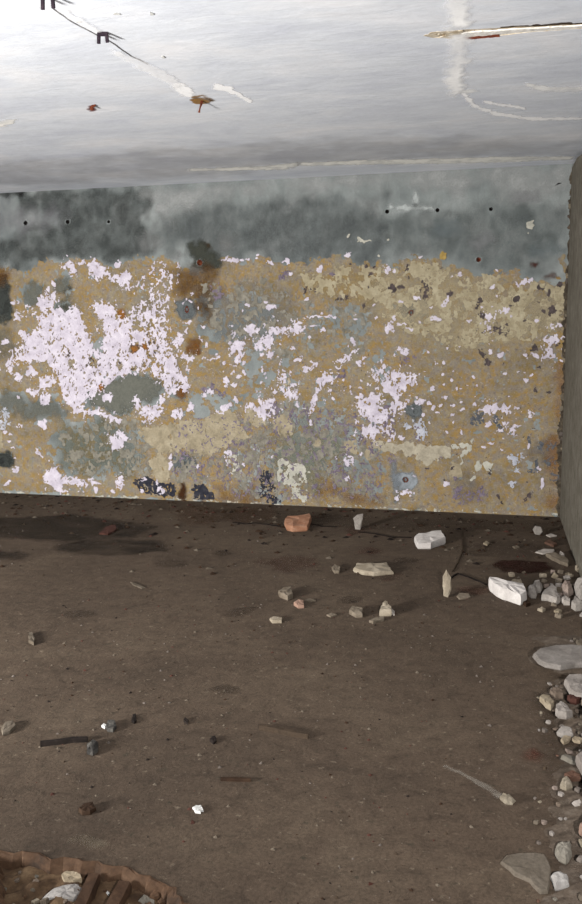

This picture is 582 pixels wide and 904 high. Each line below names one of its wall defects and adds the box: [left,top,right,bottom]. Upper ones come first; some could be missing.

crack [53,9,148,64]
crack [424,22,582,39]
corrosion [190,95,214,104]
leakage [0,191,203,270]
leakage [176,239,230,269]
peeling [0,155,582,577]